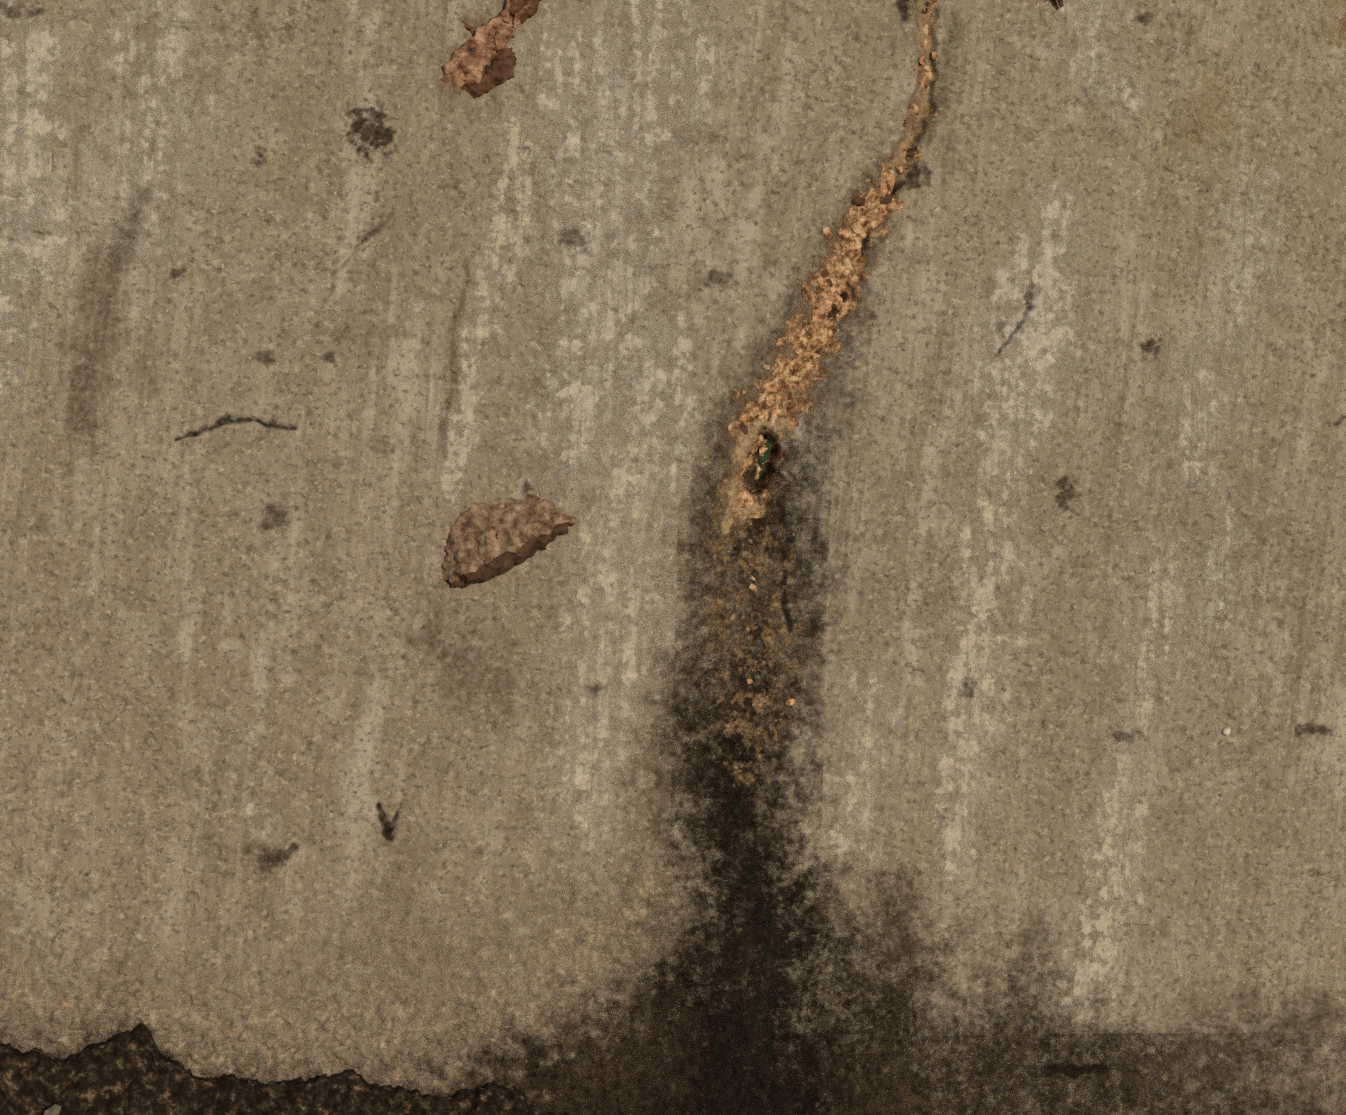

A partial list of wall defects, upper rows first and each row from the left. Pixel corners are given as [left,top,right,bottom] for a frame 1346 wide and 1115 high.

crack [703,0,939,786]
water stain [368,0,1346,1115]